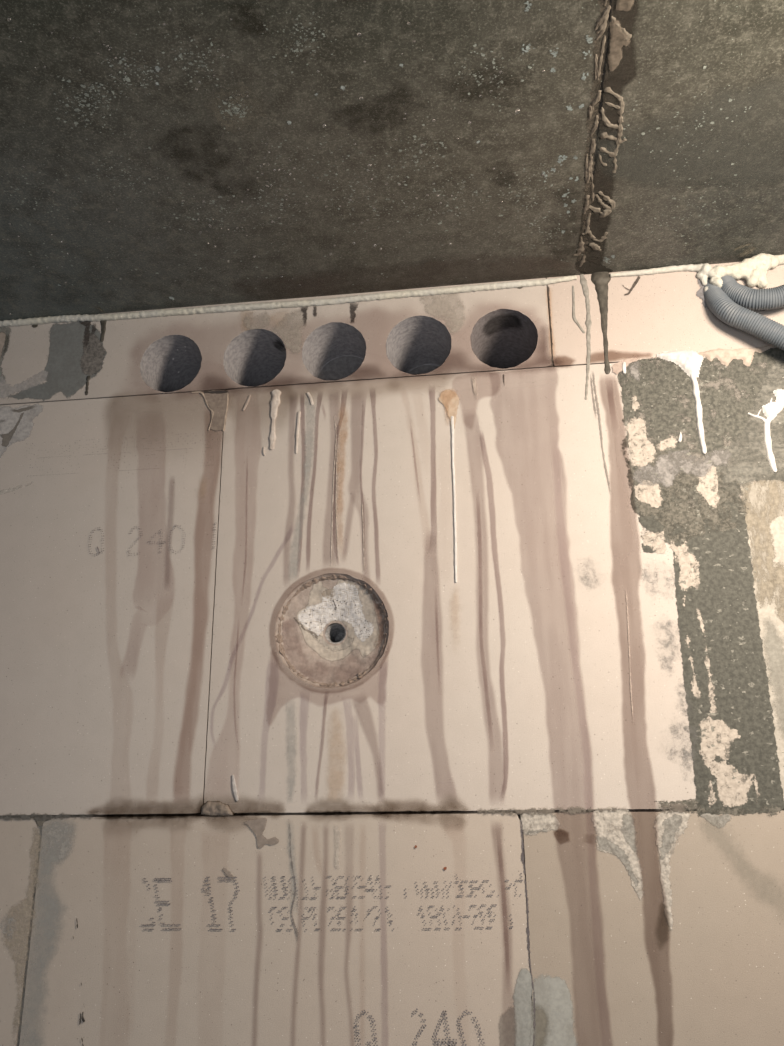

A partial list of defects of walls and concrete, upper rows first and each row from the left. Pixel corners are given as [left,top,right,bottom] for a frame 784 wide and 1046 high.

damp [369,262,461,292]
damp [473,261,538,282]
damp [245,276,347,352]
damp [580,255,615,400]
peeling [0,403,43,458]
damp [263,389,282,456]
peeling [625,395,730,508]
peeling [640,531,701,606]
damp [478,806,617,816]
damp [661,803,684,813]
spalling [591,806,645,900]